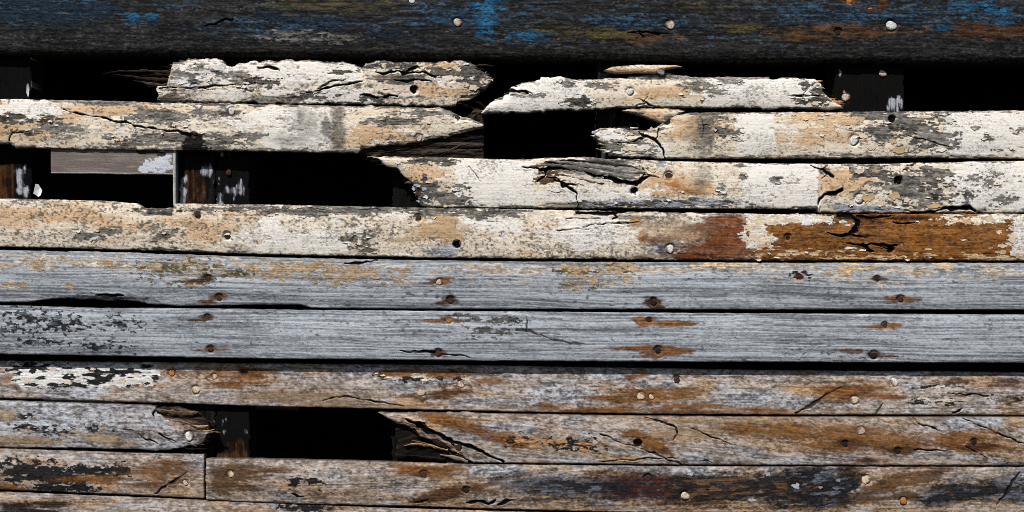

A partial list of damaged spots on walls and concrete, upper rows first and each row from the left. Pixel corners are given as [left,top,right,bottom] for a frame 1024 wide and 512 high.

crack [301,67,438,99]
peeling [0,109,85,140]
crack [63,109,191,137]
peeling [102,58,493,151]
crack [523,96,666,231]
peeling [532,78,1024,281]
crack [810,164,976,252]
rust [188,294,227,321]
rust [632,296,699,327]
peeling [0,305,163,393]
rust [610,345,695,357]
peeling [0,455,132,493]